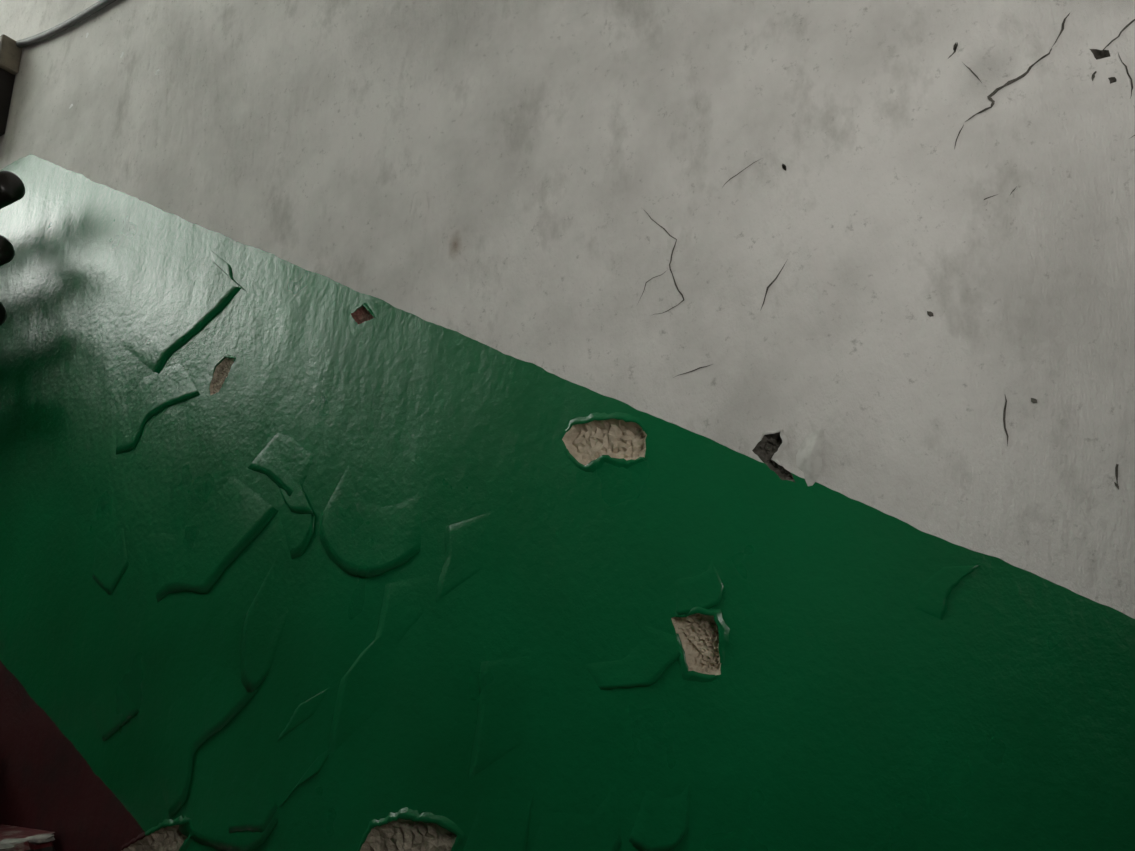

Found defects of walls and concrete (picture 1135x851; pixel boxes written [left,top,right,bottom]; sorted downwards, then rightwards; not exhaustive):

peeling [116,250,248,454]
peeling [248,433,313,496]
flaking render [562,412,647,472]
flaking render [671,607,730,682]
flaking render [121,816,193,851]
flaking render [357,807,465,851]